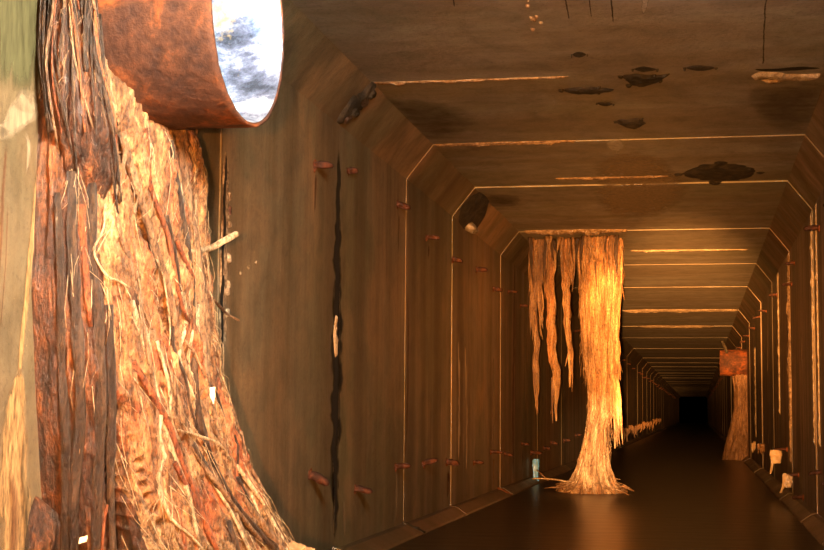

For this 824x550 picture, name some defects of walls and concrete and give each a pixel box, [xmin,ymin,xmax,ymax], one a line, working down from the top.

crack [761,0,769,63]
crack [331,157,343,550]